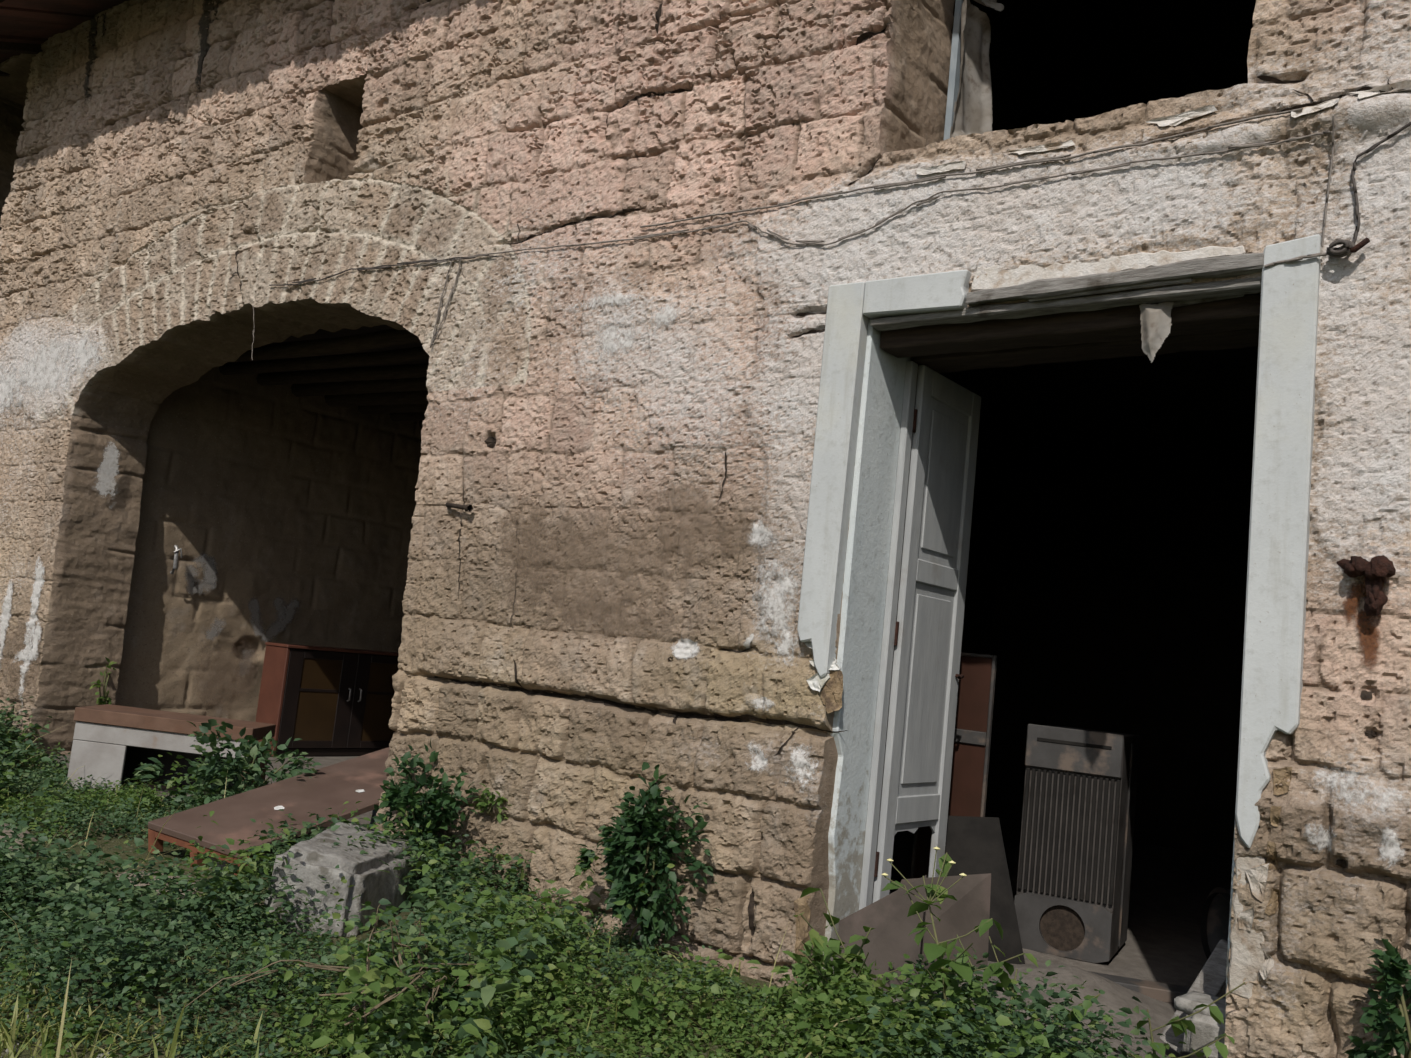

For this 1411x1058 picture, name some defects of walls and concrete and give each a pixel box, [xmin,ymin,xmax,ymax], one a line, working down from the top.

water stain [195,0,221,96]
crack [655,0,663,34]
water stain [750,520,775,545]
water stain [0,557,45,700]
water stain [744,560,798,659]
rust [1343,575,1389,667]
spalling [1238,767,1292,931]
peeling [1259,952,1274,980]